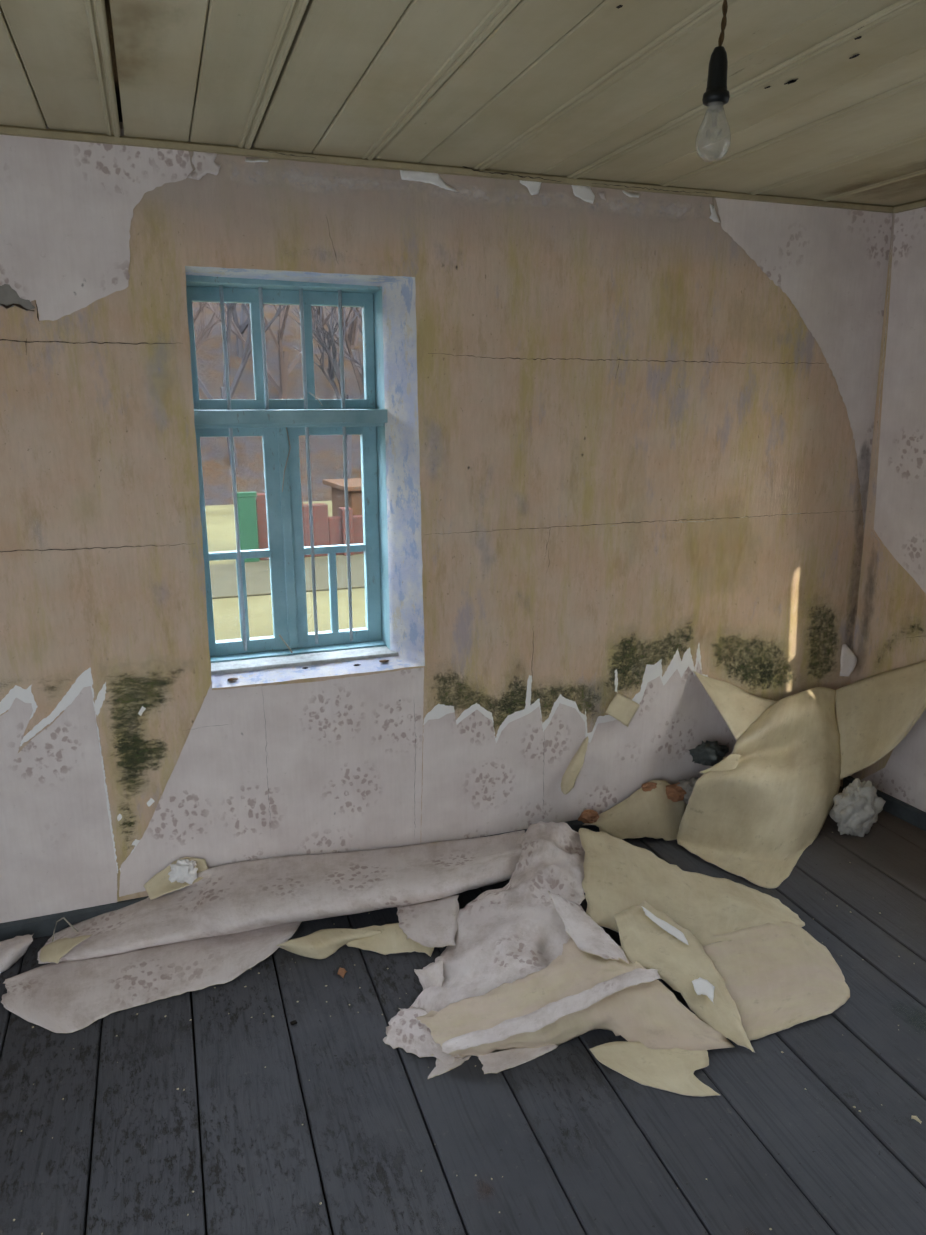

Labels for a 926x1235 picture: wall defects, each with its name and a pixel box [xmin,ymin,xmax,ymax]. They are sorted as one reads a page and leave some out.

peeling [400,170,458,192]
peeling [520,180,541,195]
peeling [571,185,595,204]
spalling [0,284,39,320]
mould [434,626,692,728]
mould [714,636,792,689]
mould [807,607,837,678]
mould [111,669,181,792]